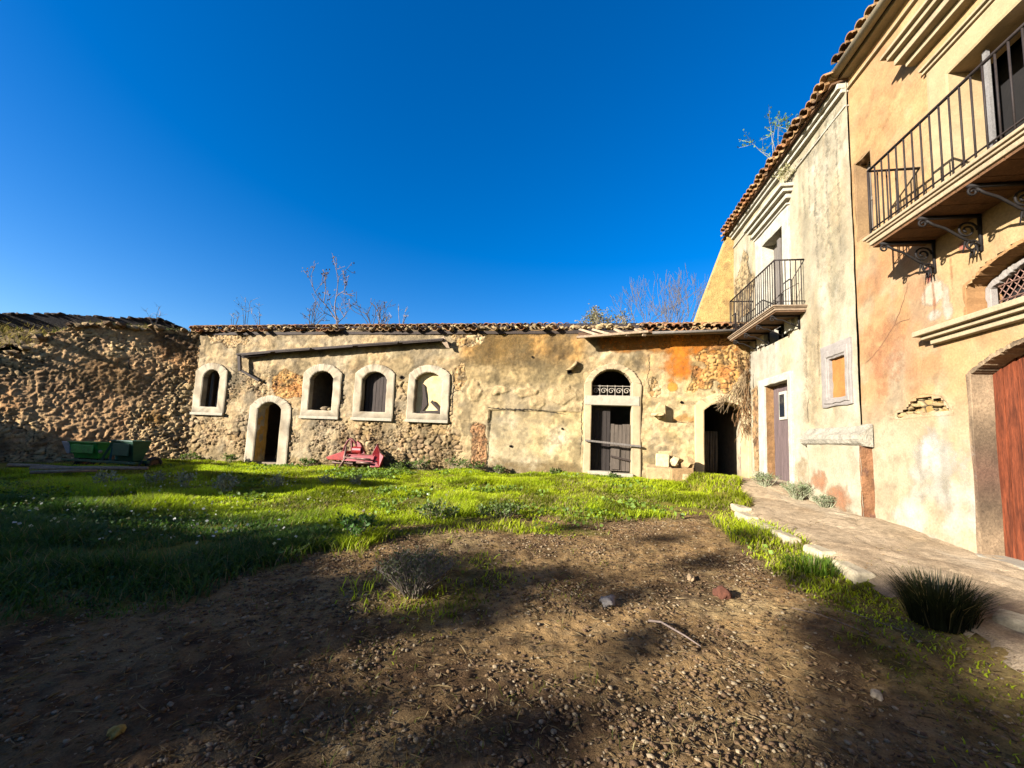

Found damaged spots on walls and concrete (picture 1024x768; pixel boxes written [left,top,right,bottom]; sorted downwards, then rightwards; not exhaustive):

flaking render [272,369,303,399]
spalling [680,338,746,404]
spalling [889,391,954,420]